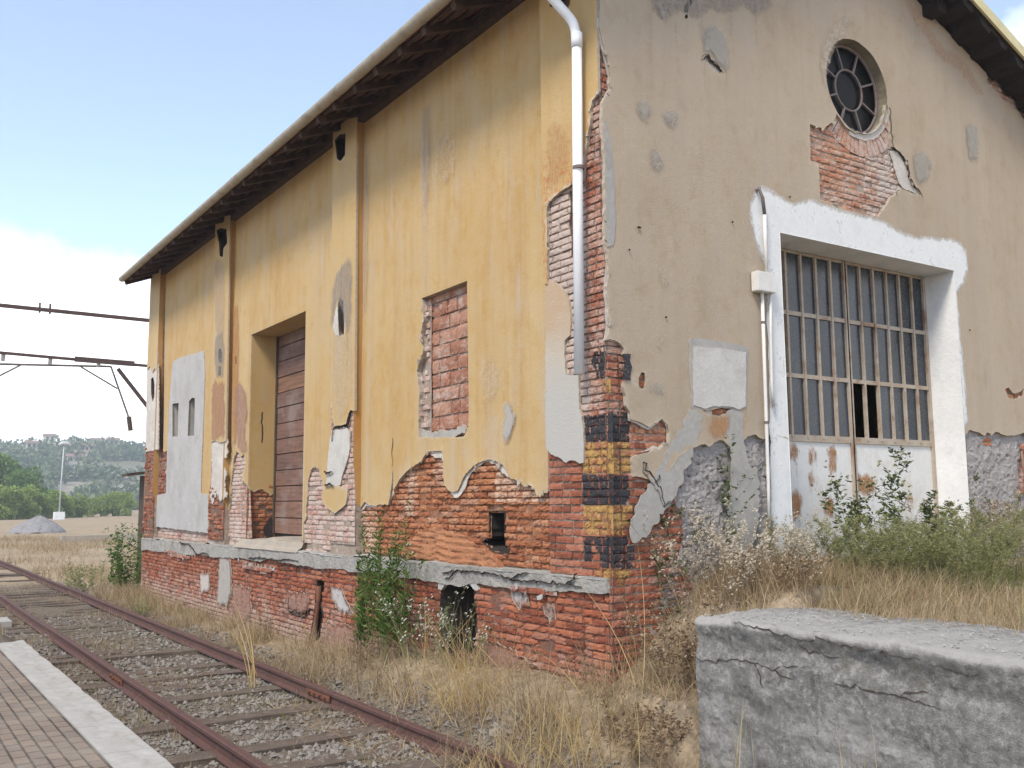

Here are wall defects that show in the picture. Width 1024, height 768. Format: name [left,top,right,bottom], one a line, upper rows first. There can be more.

spalling [702,54,723,73]
spalling [810,117,919,217]
spalling [301,49,694,684]
spalling [141,447,167,538]
rust [792,492,802,519]
rust [858,475,874,497]
crack [442,569,581,587]
crack [696,622,980,689]
crack [835,683,940,710]